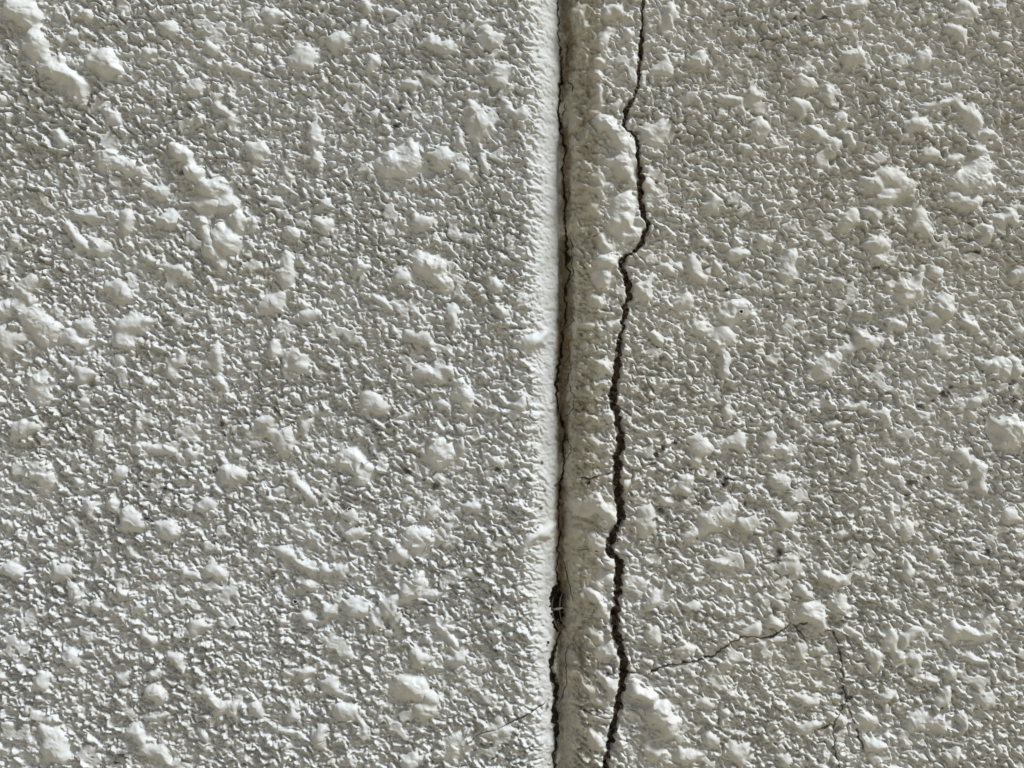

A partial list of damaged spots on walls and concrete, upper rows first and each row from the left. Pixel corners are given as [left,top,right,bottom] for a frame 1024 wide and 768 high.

crack [463,0,864,768]